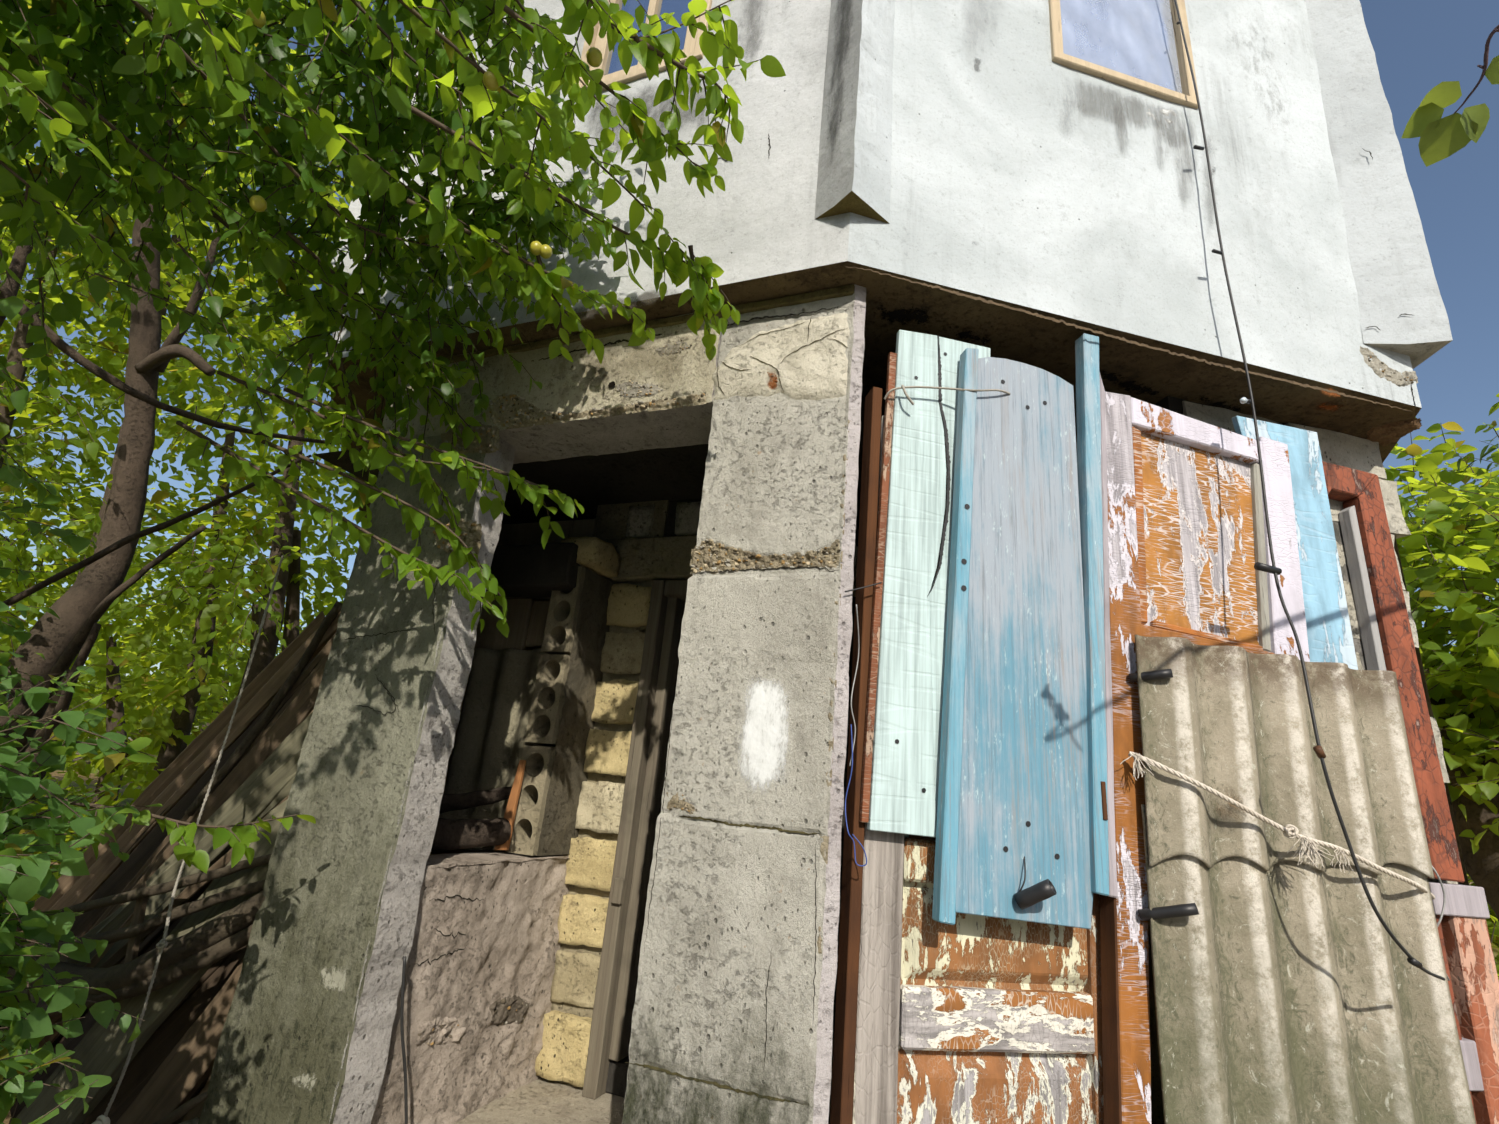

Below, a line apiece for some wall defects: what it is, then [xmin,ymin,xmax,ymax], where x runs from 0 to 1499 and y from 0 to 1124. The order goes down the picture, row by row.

water stain [830,0,850,139]
crack [532,334,662,361]
crack [717,307,848,395]
spalling [848,267,1422,447]